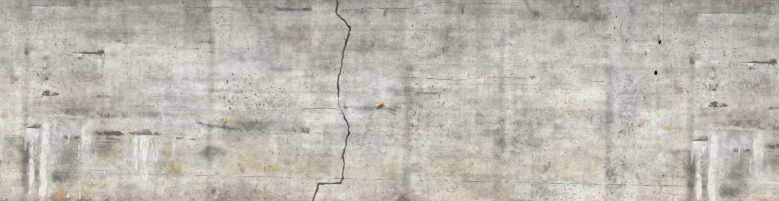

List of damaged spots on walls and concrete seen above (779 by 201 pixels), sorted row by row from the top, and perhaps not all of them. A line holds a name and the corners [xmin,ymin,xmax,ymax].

crack [305,0,351,201]
water stain [25,121,120,201]
water stain [133,132,158,186]
water stain [692,132,779,201]